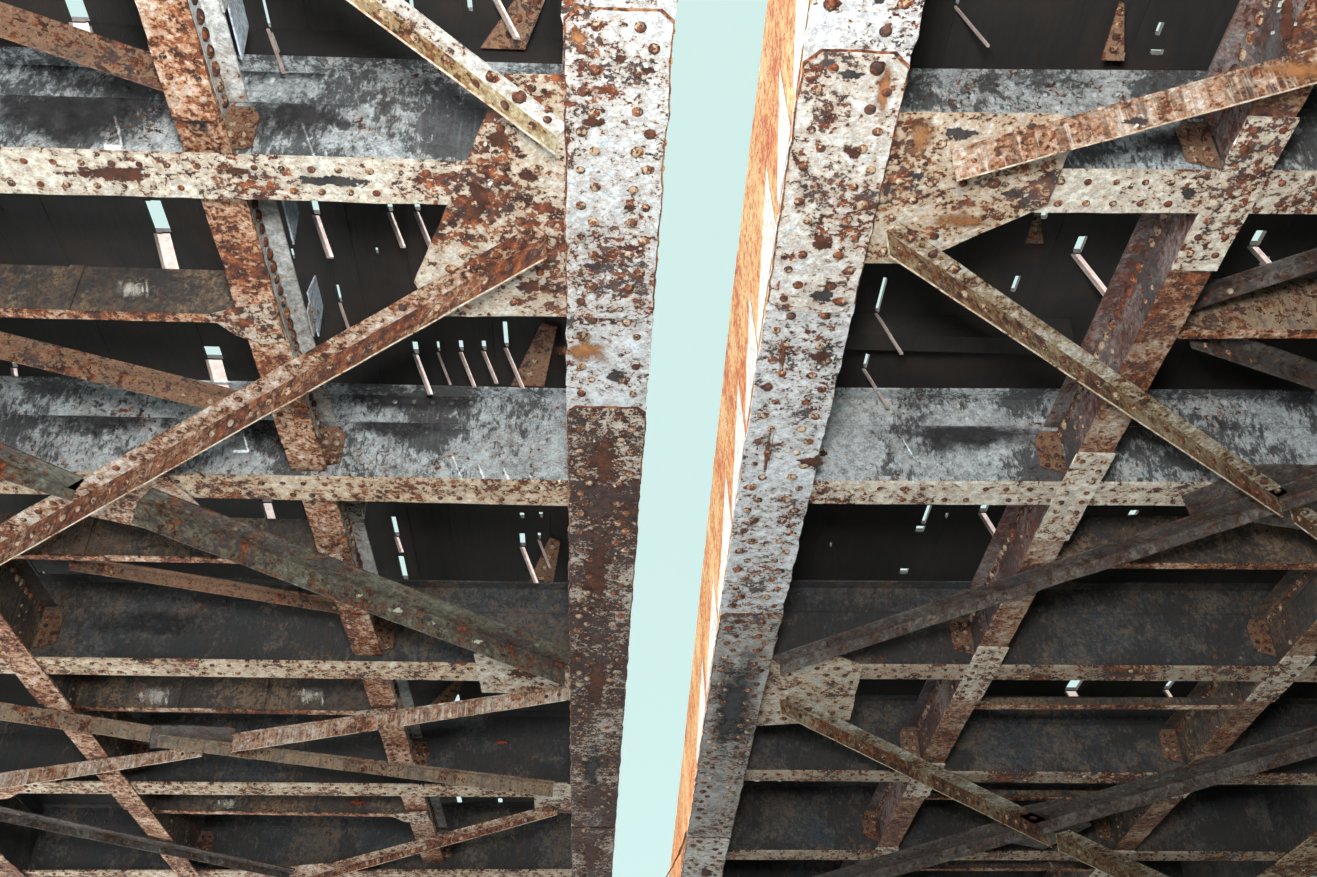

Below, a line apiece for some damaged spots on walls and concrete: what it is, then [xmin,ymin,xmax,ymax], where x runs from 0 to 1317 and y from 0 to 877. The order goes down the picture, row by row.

corrosion [609,54,656,80]
corrosion [579,114,608,128]
corrosion [483,131,514,152]
corrosion [838,141,867,167]
corrosion [52,163,162,188]
corrosion [204,166,260,177]
corrosion [518,170,549,185]
corrosion [455,179,503,227]
corrosion [811,226,841,257]
corrosion [514,276,545,299]
corrosion [568,341,604,360]
corrosion [796,446,834,475]